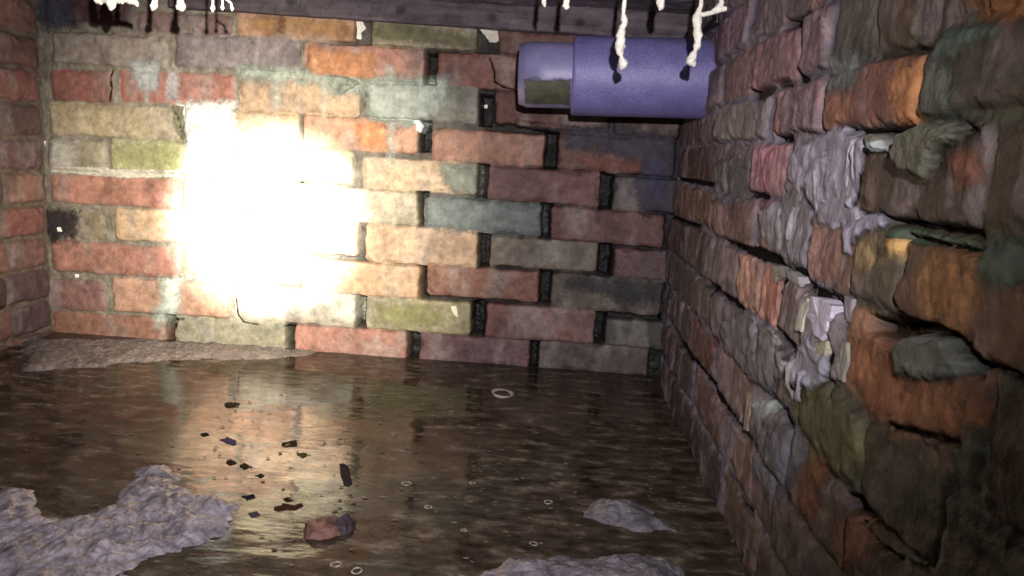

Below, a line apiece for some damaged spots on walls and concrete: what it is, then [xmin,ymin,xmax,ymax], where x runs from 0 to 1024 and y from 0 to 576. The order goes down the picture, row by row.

damp [46,209,78,242]
peeling [795,296,857,382]